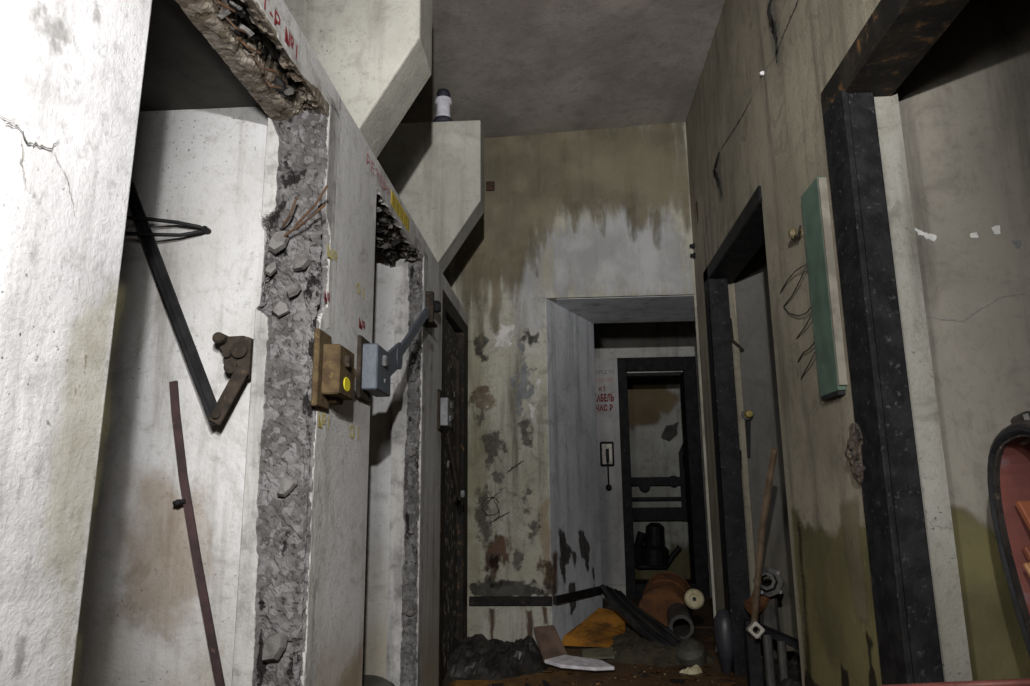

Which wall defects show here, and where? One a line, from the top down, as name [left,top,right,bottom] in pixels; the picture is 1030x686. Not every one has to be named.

crack [0,115,75,215]
spalling [175,0,341,686]
spalling [375,175,428,686]
damp [458,122,689,362]
peeling [559,529,595,614]
damp [792,503,882,686]